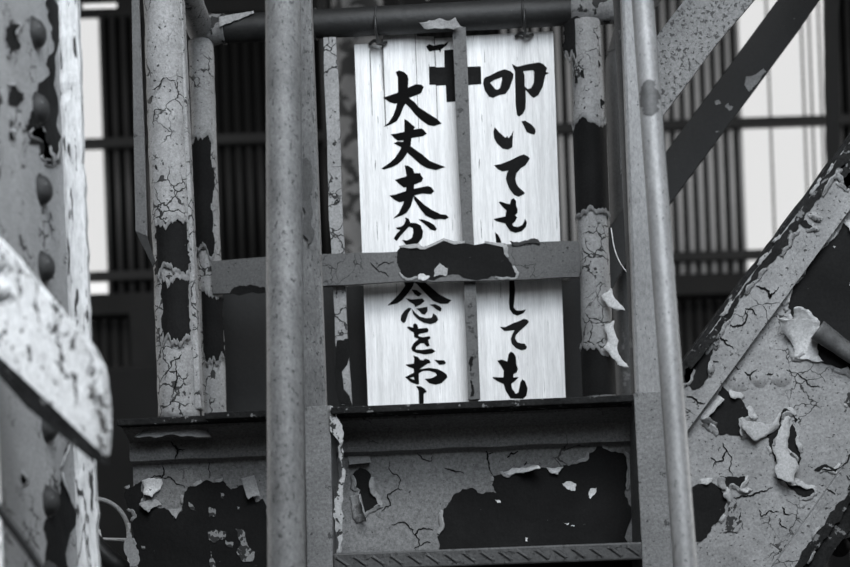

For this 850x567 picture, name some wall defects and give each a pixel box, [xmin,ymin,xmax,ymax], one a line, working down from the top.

peeling [0,0,63,172]
crack [152,77,175,125]
peeling [154,130,217,348]
peeling [397,238,540,281]
crack [713,285,819,387]
peeling [777,219,850,378]
peeling [124,475,267,567]
crack [382,461,433,549]
peeling [437,445,632,549]
crack [711,443,733,475]
crack [733,487,789,529]
crack [818,454,850,494]